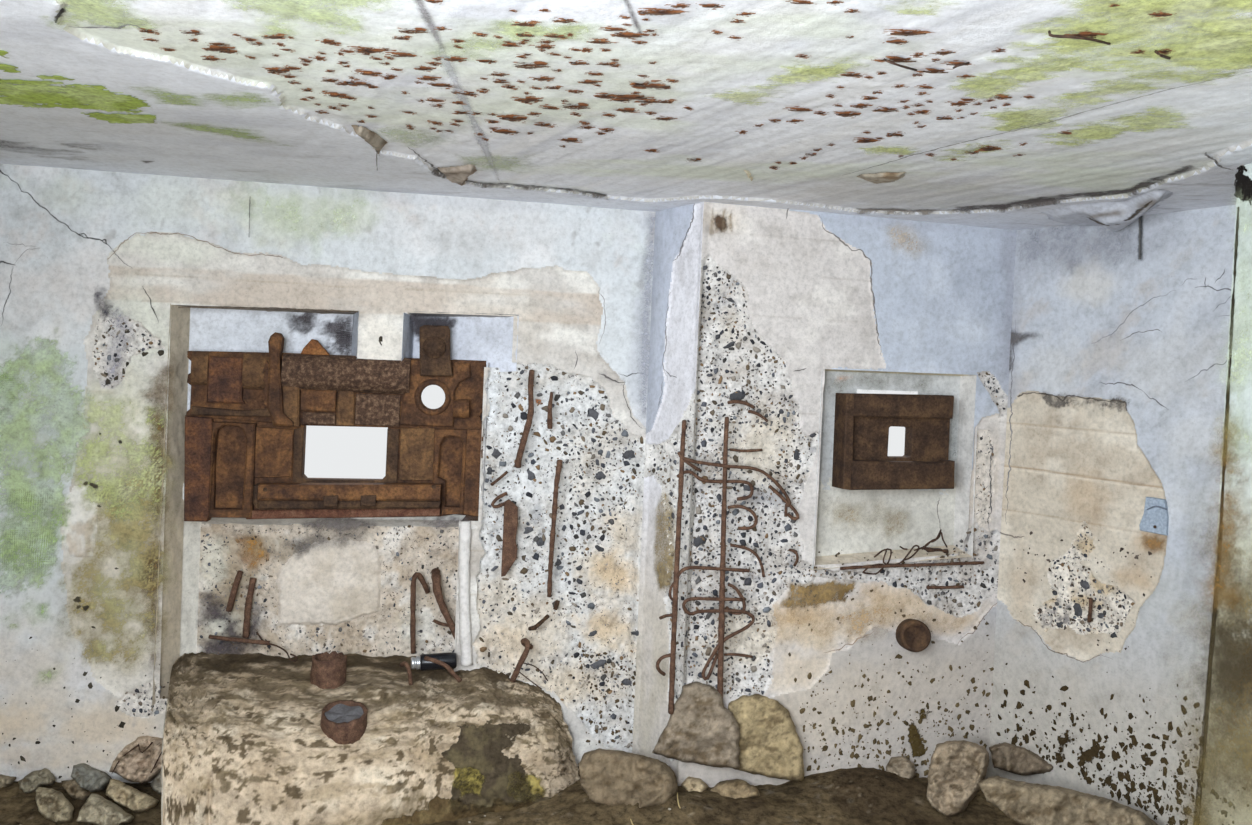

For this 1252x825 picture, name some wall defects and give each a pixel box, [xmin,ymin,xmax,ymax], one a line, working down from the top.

rust [140,28,175,51]
rust [179,3,756,148]
peeling [54,0,1252,214]
rust [769,143,833,170]
rust [736,29,1034,143]
rust [926,145,1001,160]
rust [1064,30,1108,38]
crack [0,170,359,323]
peeling [60,202,1167,785]
damp [1208,492,1239,606]